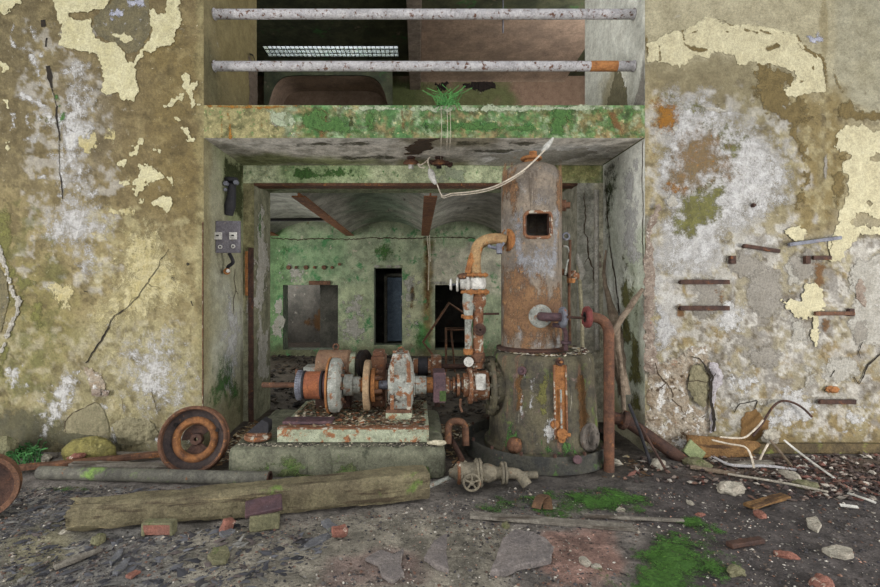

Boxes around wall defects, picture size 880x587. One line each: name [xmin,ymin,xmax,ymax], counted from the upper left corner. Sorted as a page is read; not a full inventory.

crack [41,20,60,141]
water stain [10,59,115,274]
peeling [53,0,182,102]
water stain [270,110,395,160]
corrosion [652,101,679,134]
water stain [654,90,793,283]
peeling [645,17,880,262]
water stain [0,345,28,388]
crack [85,249,189,363]
crack [583,181,622,330]
spalling [643,194,711,452]
peeling [780,282,826,347]